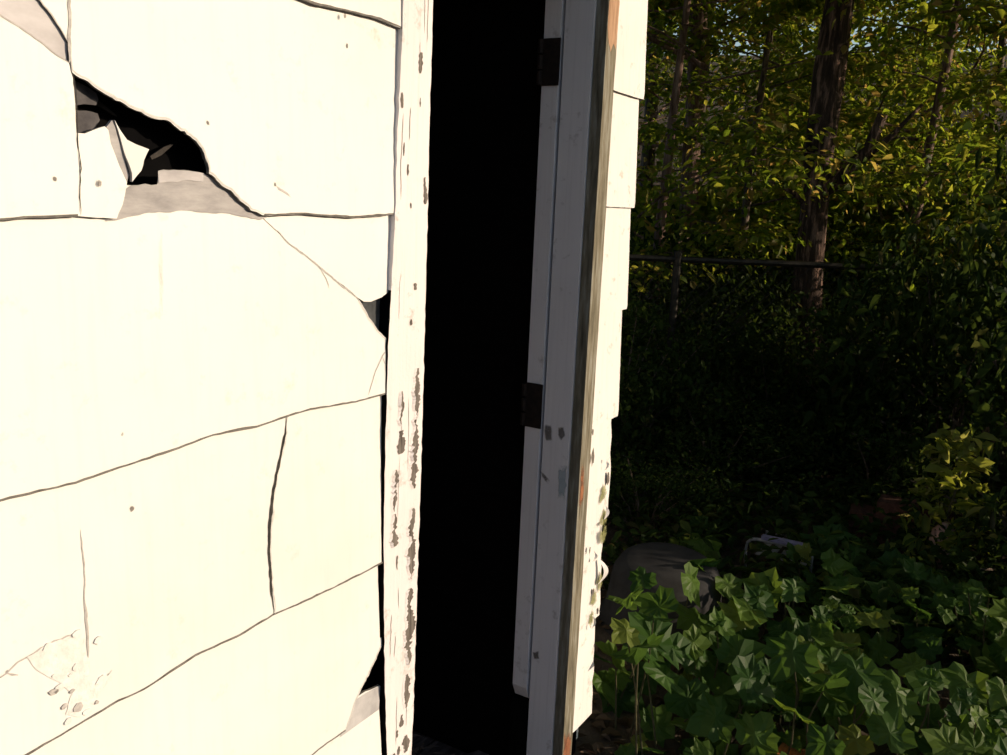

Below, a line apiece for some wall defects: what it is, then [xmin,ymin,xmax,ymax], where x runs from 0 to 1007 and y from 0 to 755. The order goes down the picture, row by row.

spalling [0,0,267,221]
crack [264,219,357,298]
crack [0,537,89,678]
peeling [48,663,99,725]
crack [268,417,288,614]
peeling [340,368,421,755]